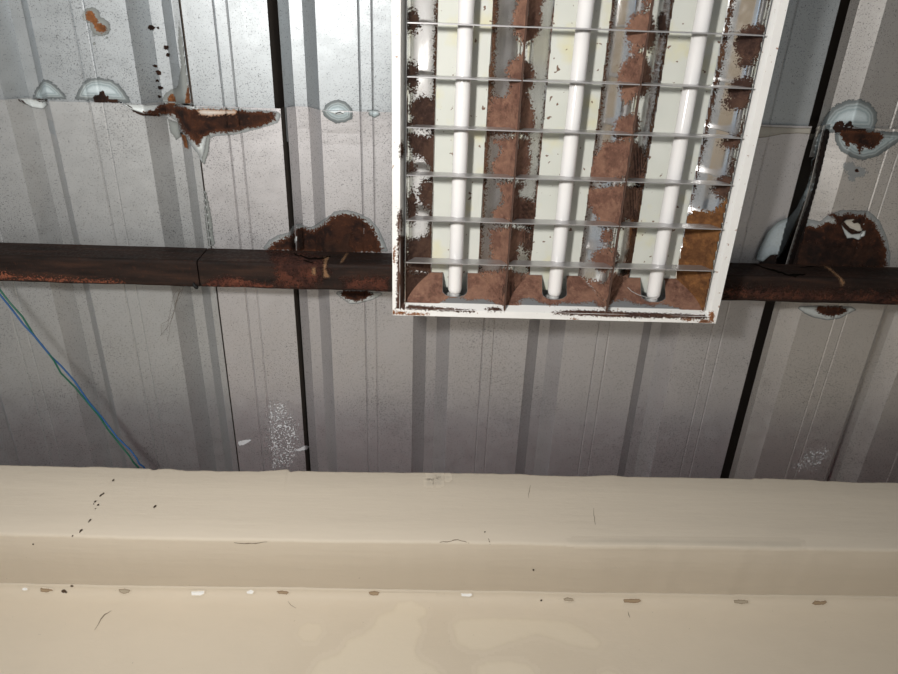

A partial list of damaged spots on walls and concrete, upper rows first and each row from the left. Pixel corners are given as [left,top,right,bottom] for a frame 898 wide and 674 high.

rust [82,7,111,45]
rust [143,22,281,164]
rust [203,0,765,323]
rust [835,130,898,160]
rust [722,210,898,320]
leakage [253,593,645,674]